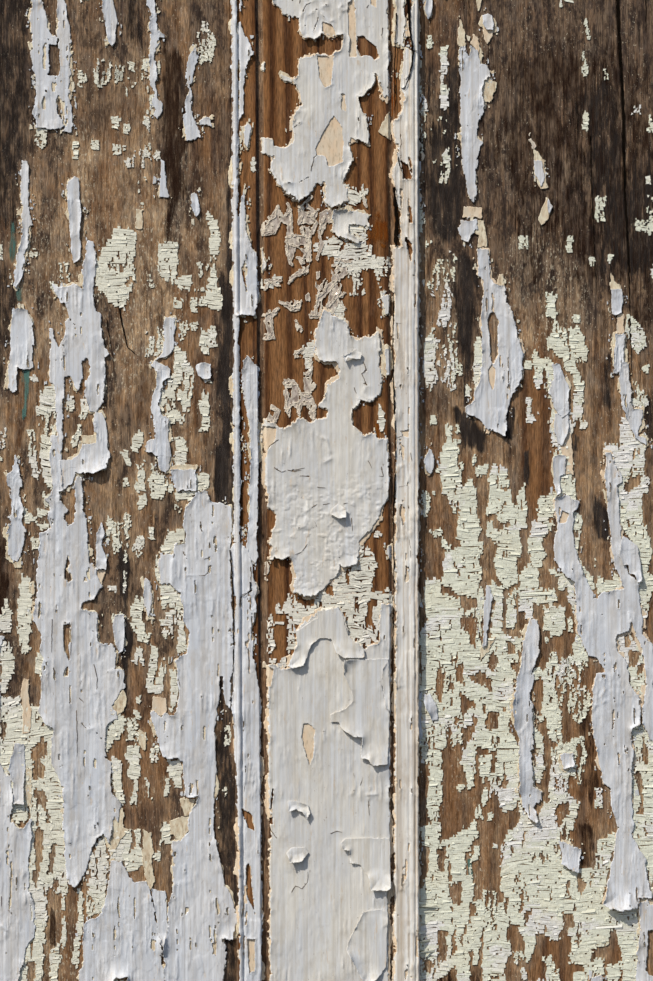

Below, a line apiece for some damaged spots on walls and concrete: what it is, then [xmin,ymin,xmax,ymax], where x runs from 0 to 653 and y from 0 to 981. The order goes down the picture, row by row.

peeling [25,0,165,159]
peeling [178,21,216,141]
peeling [438,45,450,122]
peeling [454,16,497,203]
peeling [0,160,40,291]
peeling [61,176,88,263]
peeling [112,143,172,198]
peeling [157,187,223,313]
peeling [532,150,553,225]
peeling [3,303,39,393]
peeling [0,636,15,693]
peeling [130,576,166,694]